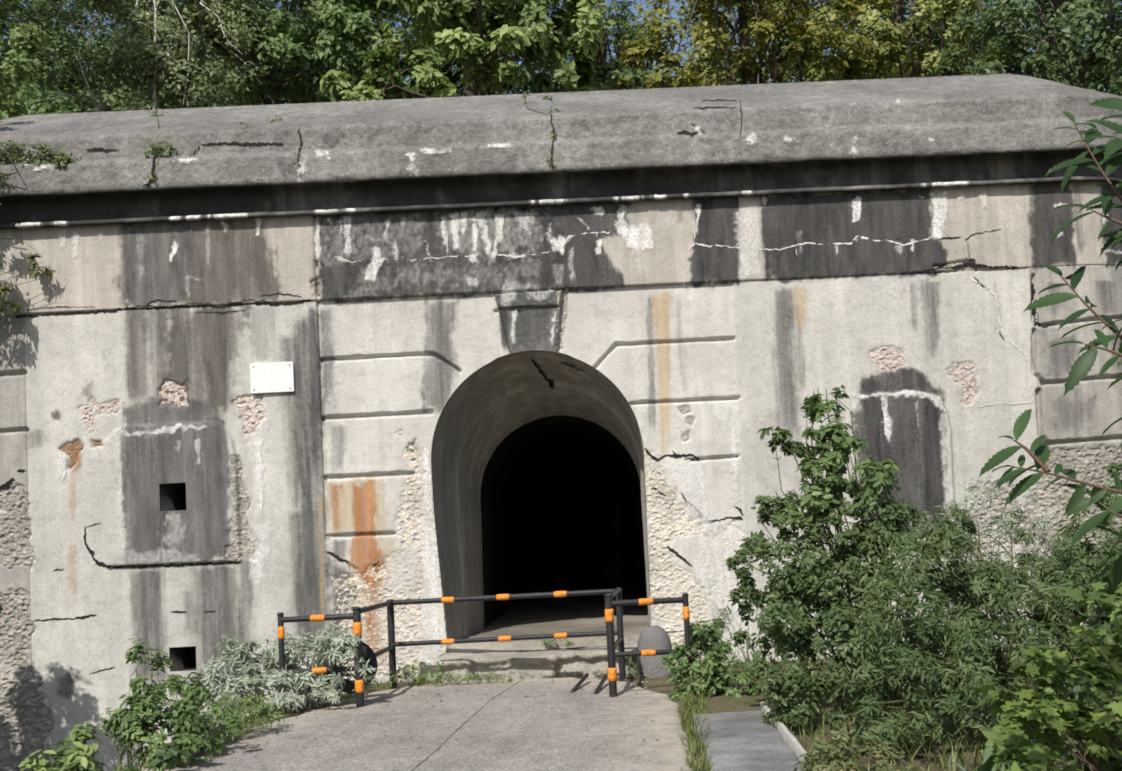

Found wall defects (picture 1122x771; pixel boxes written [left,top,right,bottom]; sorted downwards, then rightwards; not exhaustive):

spalling [0,481,35,569]
spalling [0,589,36,683]
crack [83,523,241,569]
leakage [118,213,279,695]
corrosion [333,479,384,637]
spalling [330,432,446,680]
leakage [286,196,653,670]
crack [531,359,584,389]
spalling [643,449,752,666]
leakage [678,181,967,424]
crack [687,228,1054,407]
leakage [838,368,947,533]